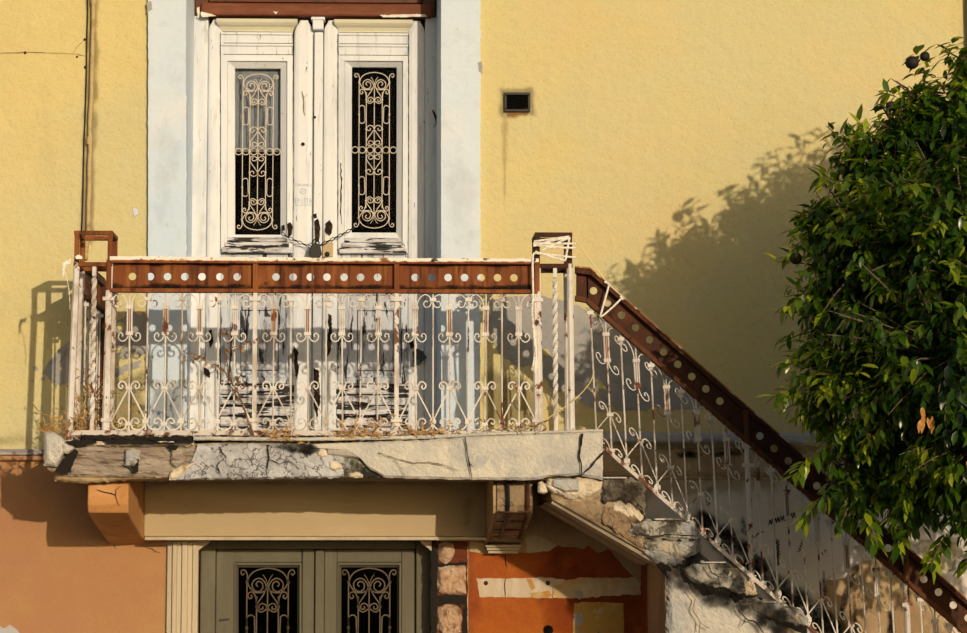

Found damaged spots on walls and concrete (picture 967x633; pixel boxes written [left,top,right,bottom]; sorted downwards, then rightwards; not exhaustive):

peeling [30,341,91,388]
peeling [484,295,703,413]
spalling [54,439,196,484]
spalling [317,449,382,479]
crack [549,433,603,478]
peeling [0,625,19,633]